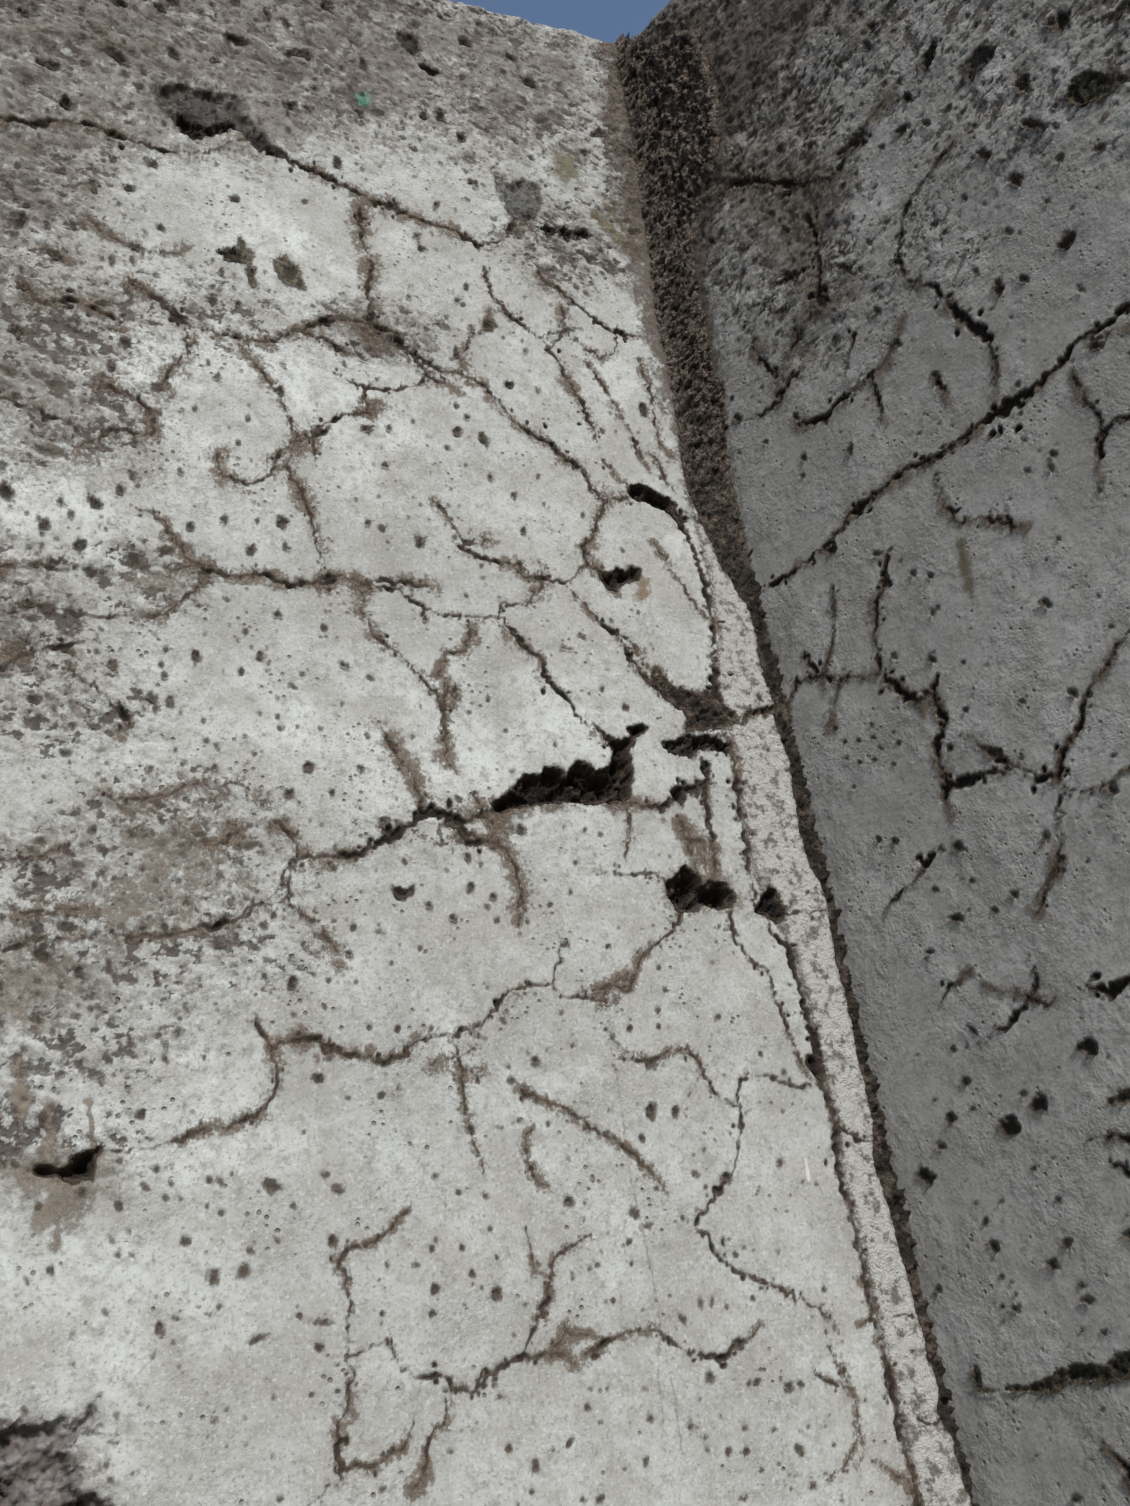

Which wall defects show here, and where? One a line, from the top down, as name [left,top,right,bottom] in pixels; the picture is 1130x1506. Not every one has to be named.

spalling [168,110,283,158]
crack [719,84,1130,919]
spalling [647,666,775,806]
spalling [491,722,649,834]
crack [0,111,942,1506]
spalling [665,864,737,913]
spalling [755,886,787,923]
crack [940,963,1130,1047]
crack [1086,1127,1130,1178]
spalling [0,1453,61,1506]
spalling [38,1491,112,1506]
crack [1100,1438,1130,1496]